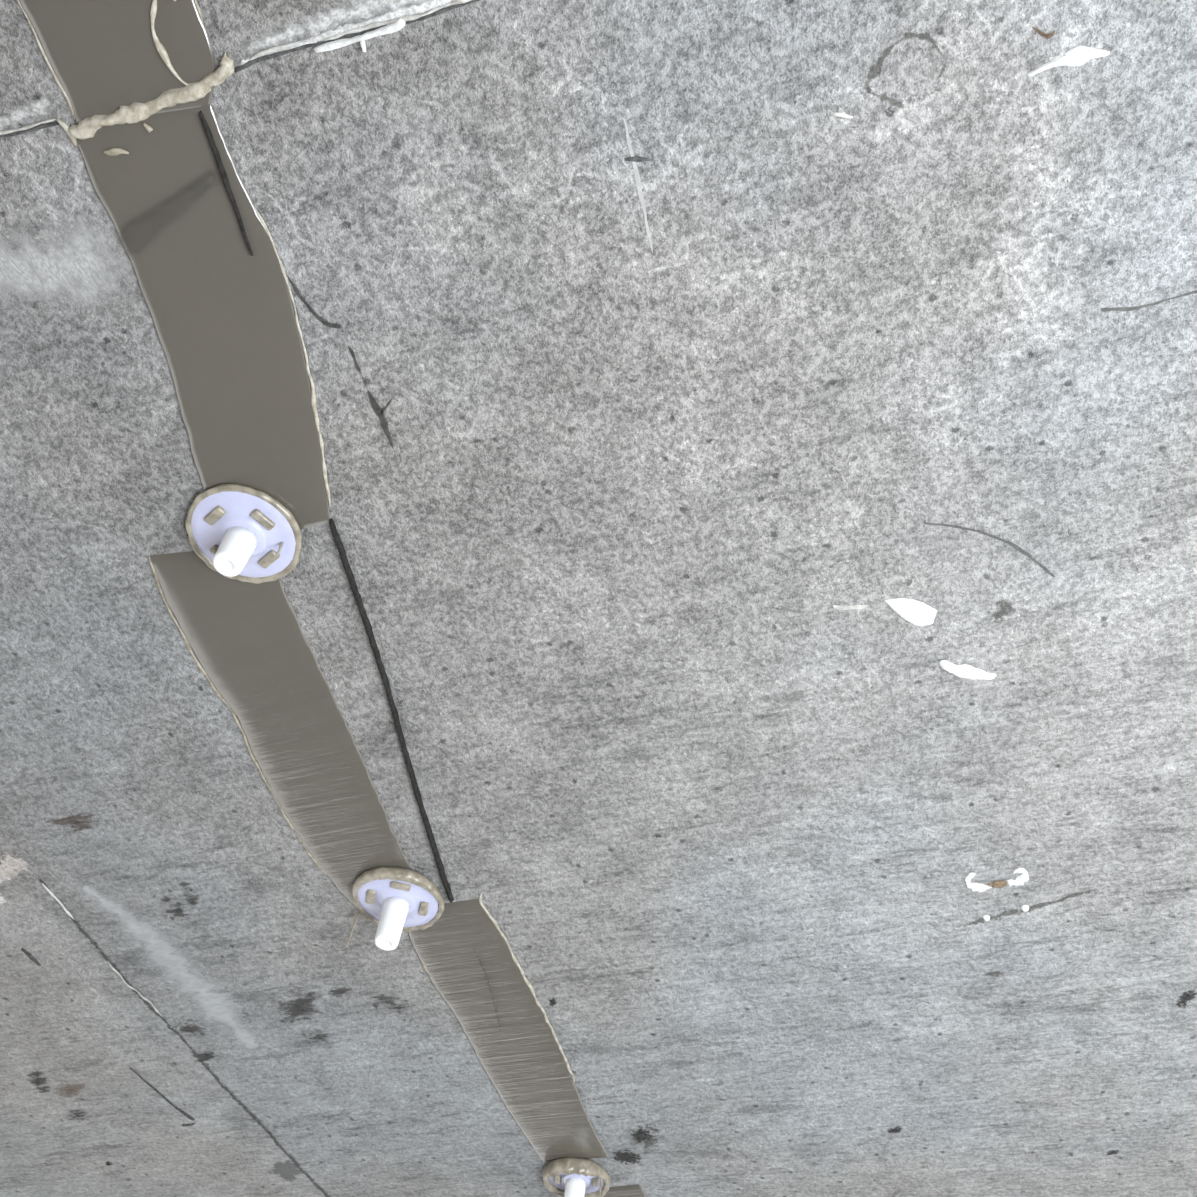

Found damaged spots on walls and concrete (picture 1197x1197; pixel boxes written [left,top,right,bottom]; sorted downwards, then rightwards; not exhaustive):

crack [199,111,254,256]
crack [288,277,393,448]
crack [329,518,454,903]
peeling [0,852,29,906]
crack [21,948,41,966]
crack [129,1067,195,1126]